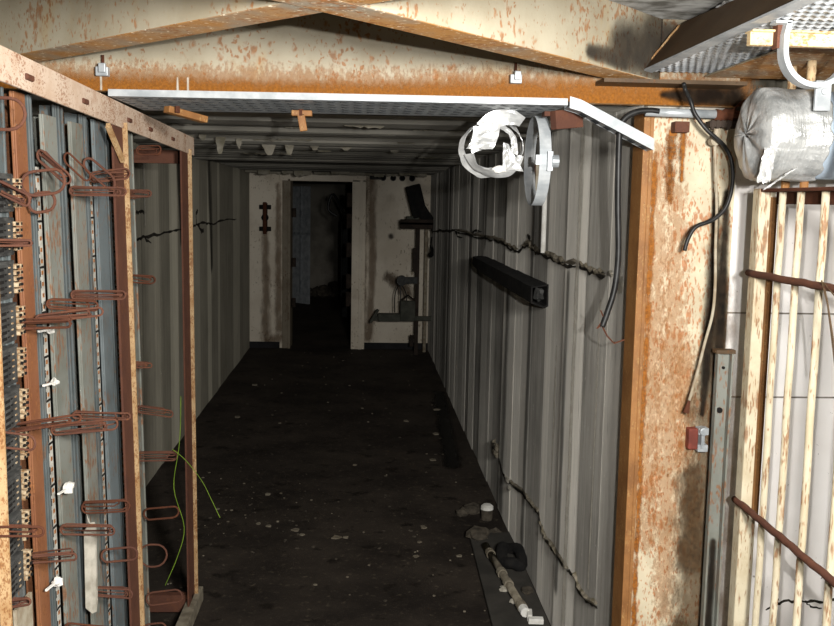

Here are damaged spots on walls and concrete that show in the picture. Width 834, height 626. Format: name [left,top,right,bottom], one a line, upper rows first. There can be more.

corrosion [64,74,716,106]
crack [137,210,236,243]
corrosion [631,130,686,626]
water stain [673,278,734,626]
crack [766,598,834,610]